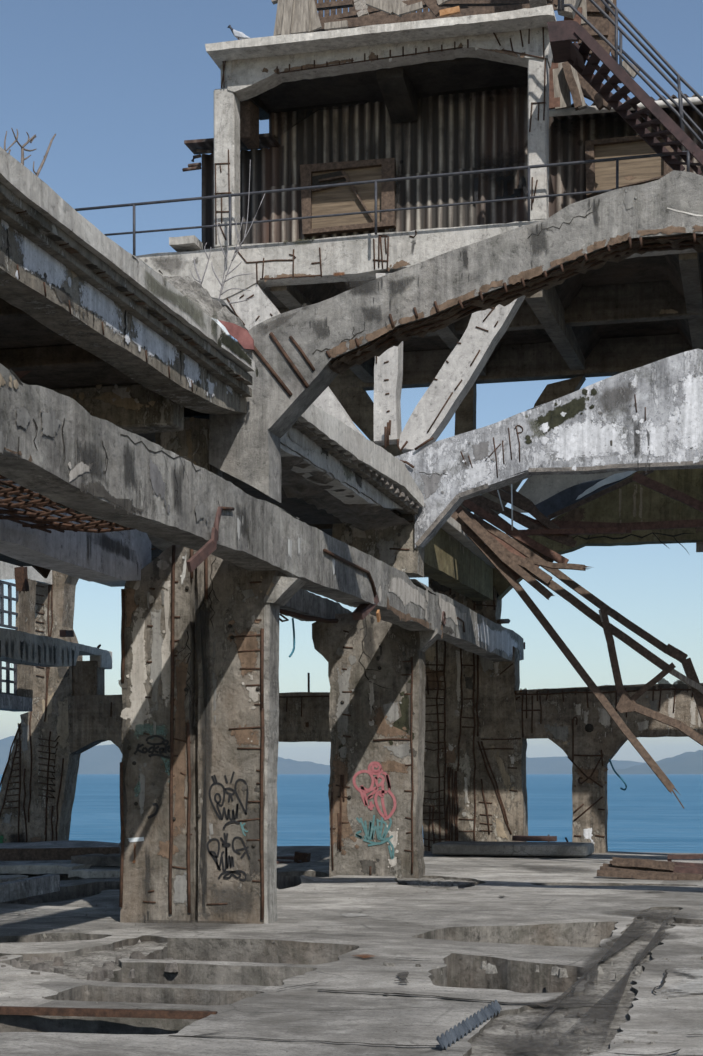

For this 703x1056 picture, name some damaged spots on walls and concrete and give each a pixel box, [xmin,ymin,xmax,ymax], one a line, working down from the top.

spalling [68,462,148,515]
flaking render [0,210,243,397]
spalling [214,149,322,388]
spalling [245,346,293,396]
flaking render [384,379,462,507]
spalling [326,225,703,375]
flaking render [459,370,703,491]
flaking render [0,666,69,843]
spalling [35,570,53,637]
spalling [110,545,192,914]
spalling [227,613,265,920]
spalling [279,427,703,876]